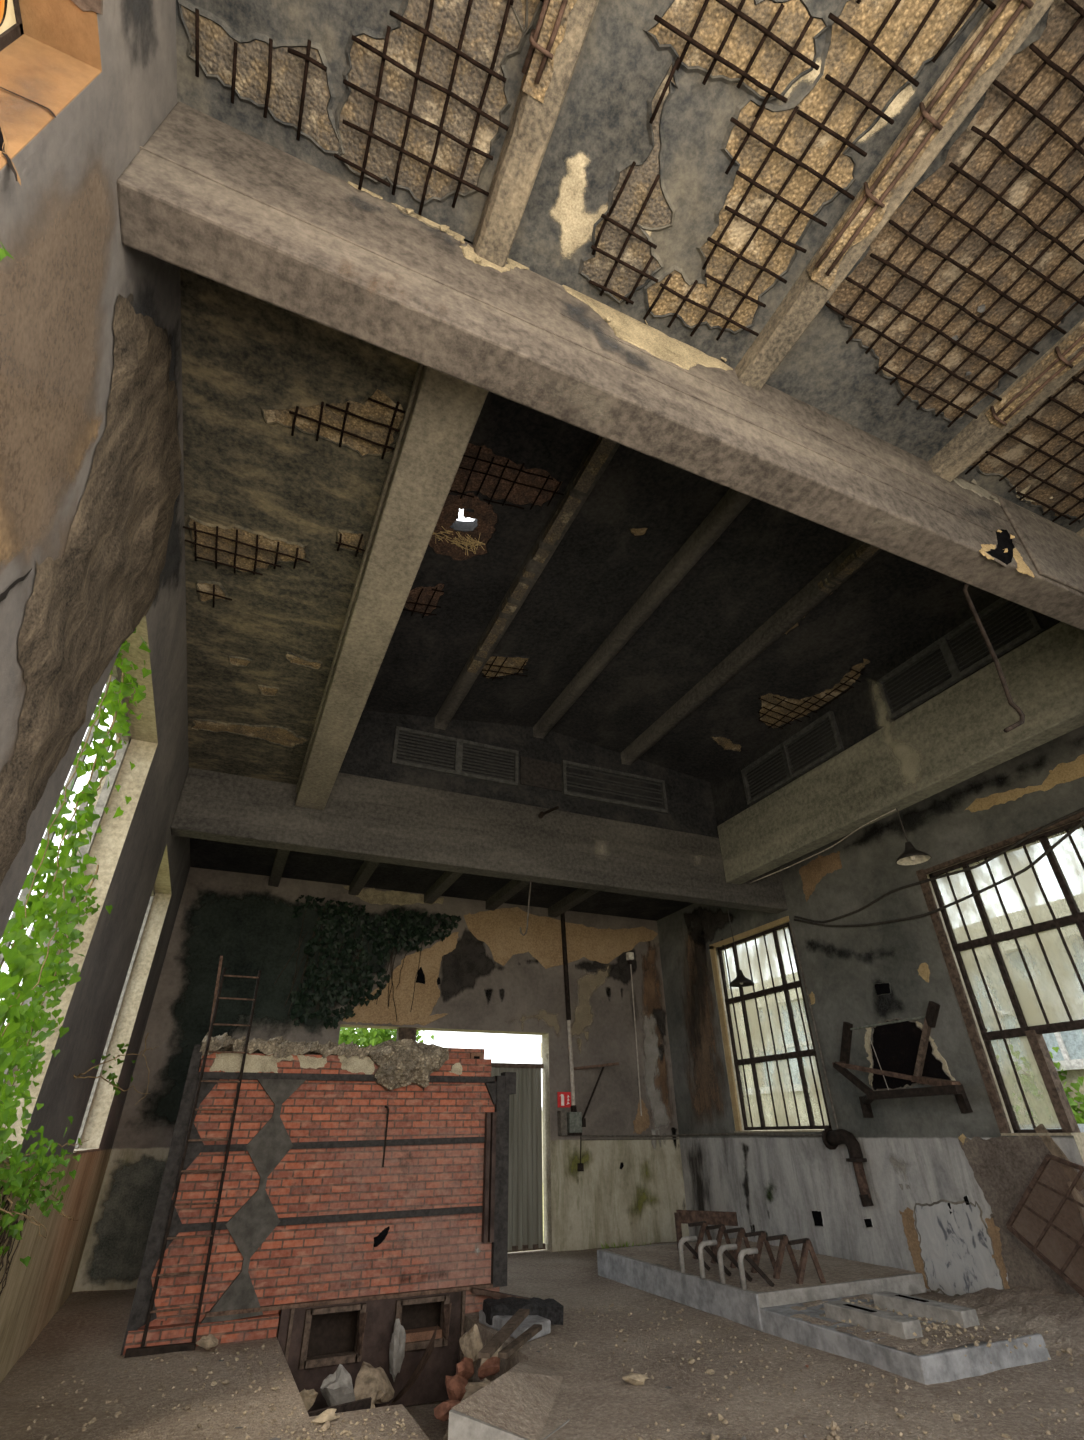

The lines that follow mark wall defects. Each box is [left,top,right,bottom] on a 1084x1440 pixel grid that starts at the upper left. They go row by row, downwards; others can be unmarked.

crack [0,87,56,185]
spalling [177,0,568,273]
spalling [562,0,1084,525]
spalling [757,657,872,729]
peeling [965,754,1084,812]
peeling [343,886,444,906]
peeling [343,907,658,1026]
spalling [864,1018,955,1091]
peeling [899,1133,1084,1297]